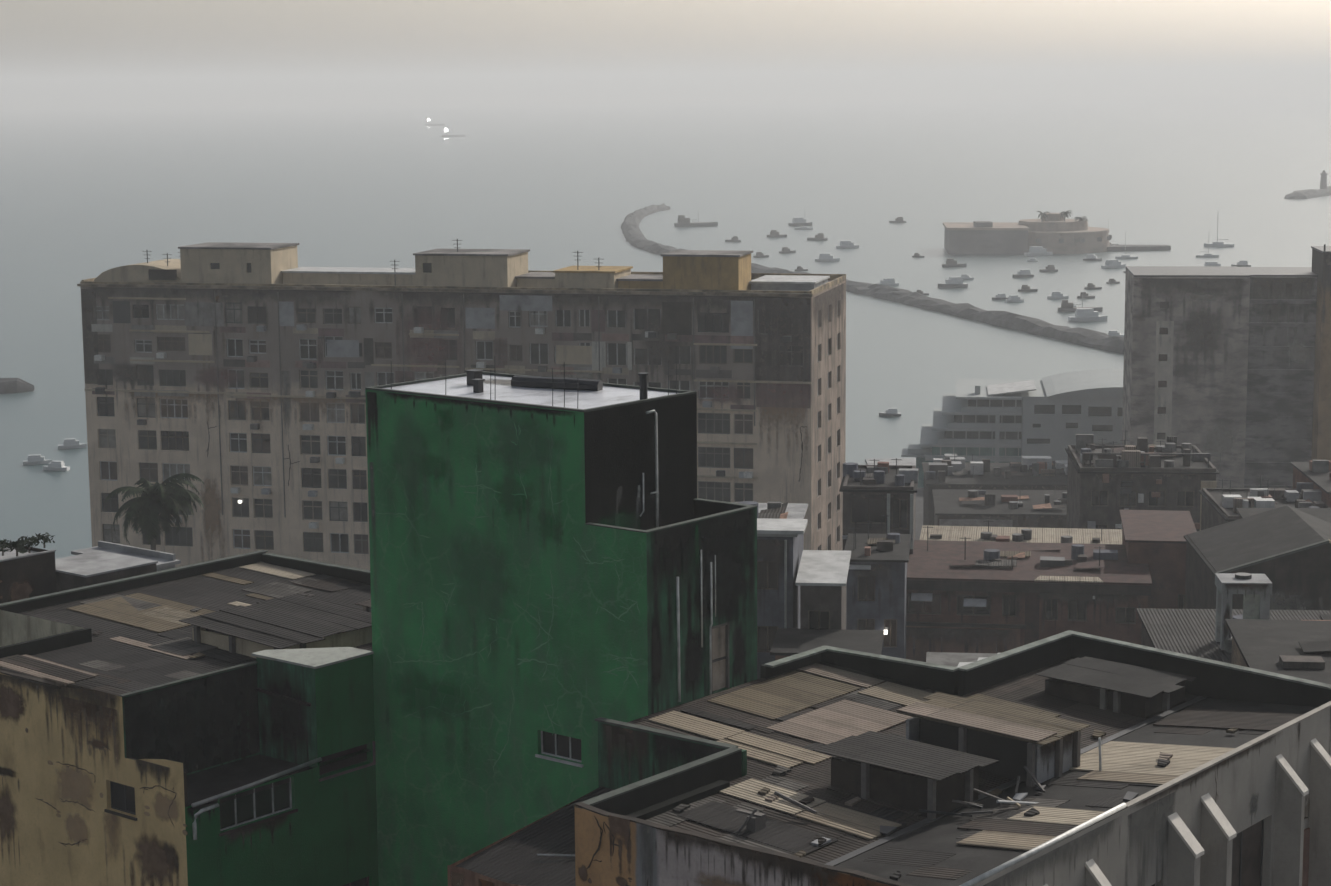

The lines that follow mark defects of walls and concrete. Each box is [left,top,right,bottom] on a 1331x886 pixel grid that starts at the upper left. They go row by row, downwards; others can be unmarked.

leakage [1142,255,1331,373]
leakage [638,509,789,714]
leakage [0,664,308,786]
leakage [0,767,20,857]
leakage [131,836,178,886]
leakage [609,815,900,886]